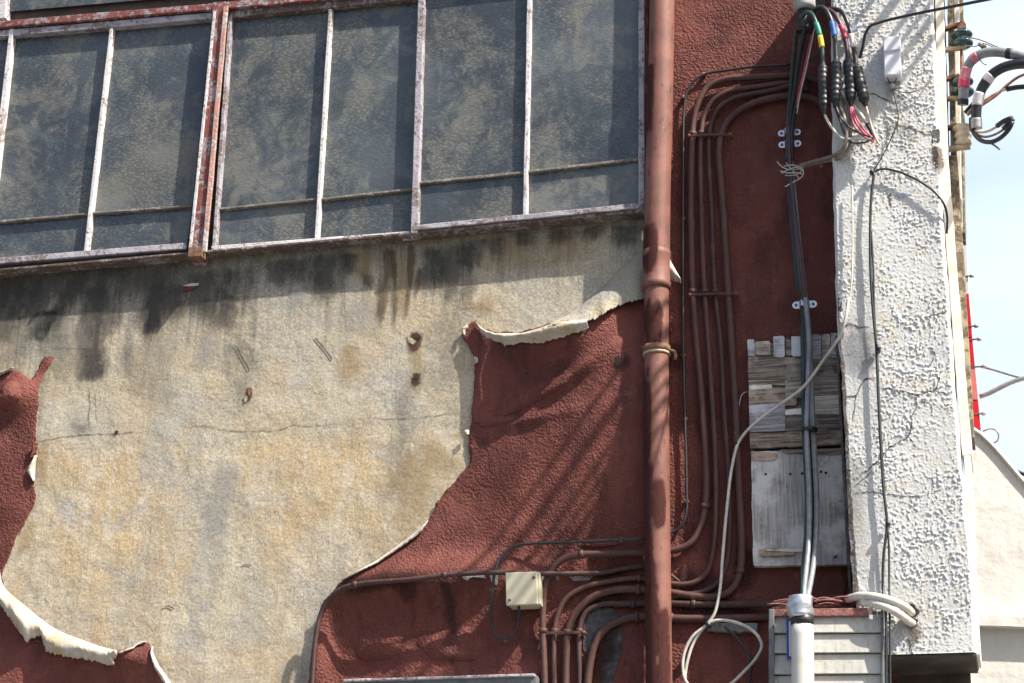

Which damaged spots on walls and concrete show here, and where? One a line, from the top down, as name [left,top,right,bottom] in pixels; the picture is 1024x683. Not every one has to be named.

leakage [269,254,354,293]
leakage [364,243,475,322]
peeling [670,260,681,284]
leakage [0,268,245,379]
corrosion [409,332,423,351]
leakage [669,344,681,365]
peeling [308,249,646,683]
crack [844,349,947,587]
peeling [0,356,171,683]